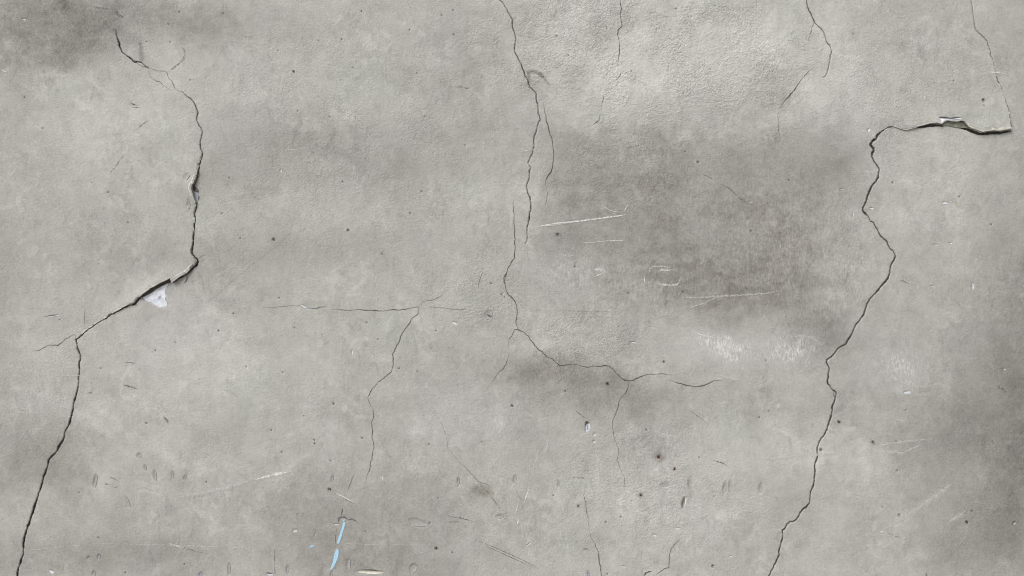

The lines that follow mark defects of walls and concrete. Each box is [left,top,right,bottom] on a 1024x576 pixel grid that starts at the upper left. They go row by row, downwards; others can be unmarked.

crack [116,33,203,180]
crack [778,5,832,141]
crack [17,297,141,576]
flaking render [138,279,173,307]
crack [176,206,200,283]
crack [265,298,460,489]
crack [478,1,719,484]
crack [769,128,896,576]